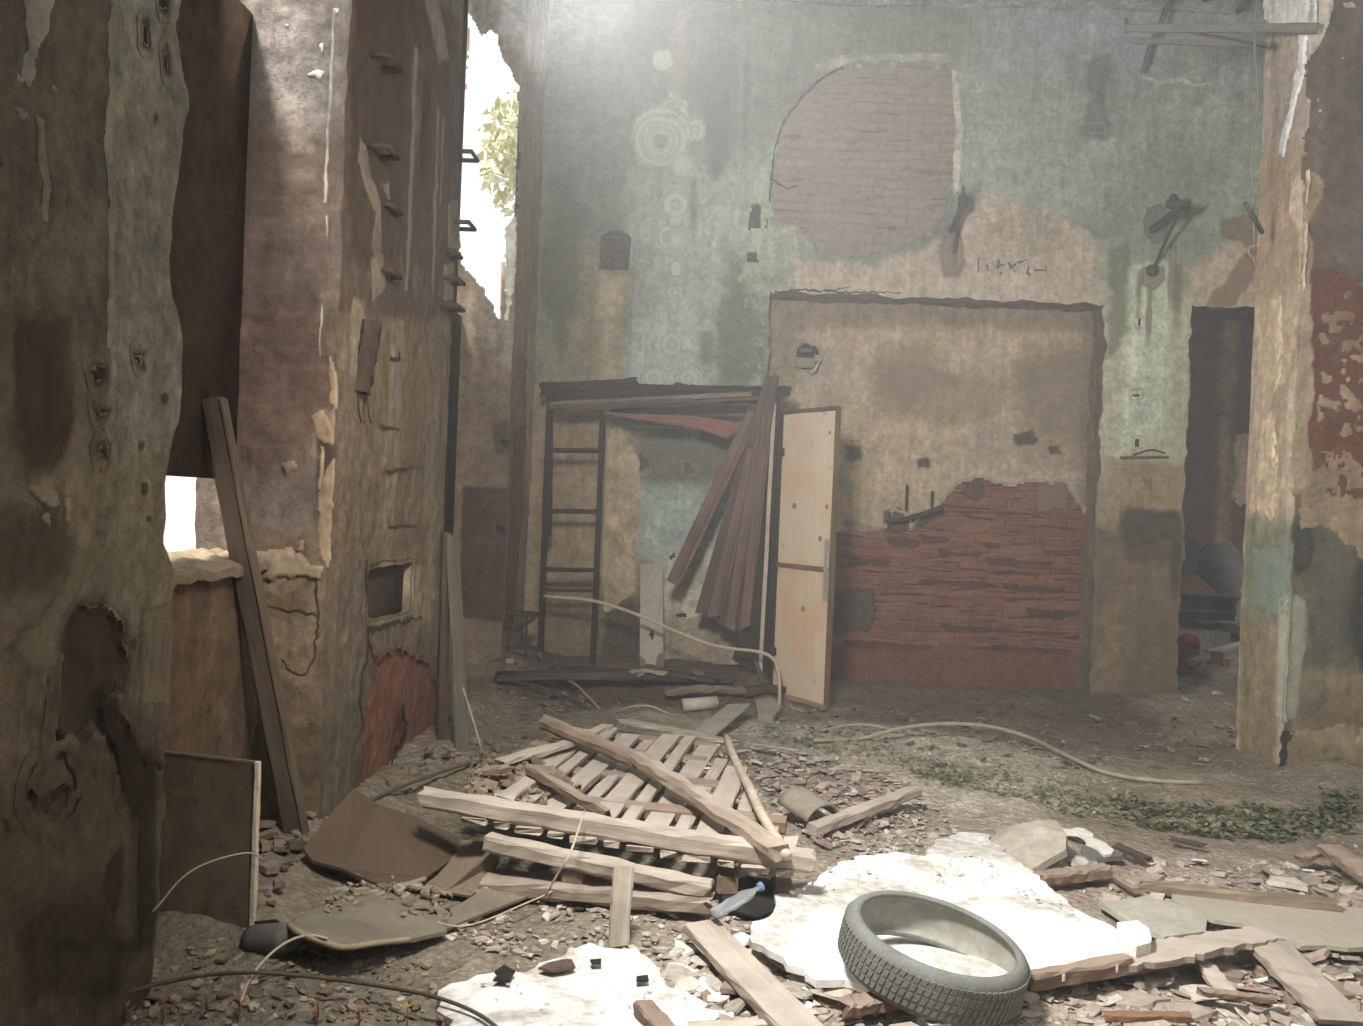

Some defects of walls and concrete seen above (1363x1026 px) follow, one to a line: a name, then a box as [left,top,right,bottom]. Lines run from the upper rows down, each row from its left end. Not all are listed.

flaking render [17,0,55,88]
spalling [738,51,964,386]
spalling [1263,0,1363,560]
flaking render [256,356,338,582]
spalling [913,455,933,472]
spalling [821,469,1096,681]
spalling [1009,424,1065,458]
spalling [28,576,167,837]